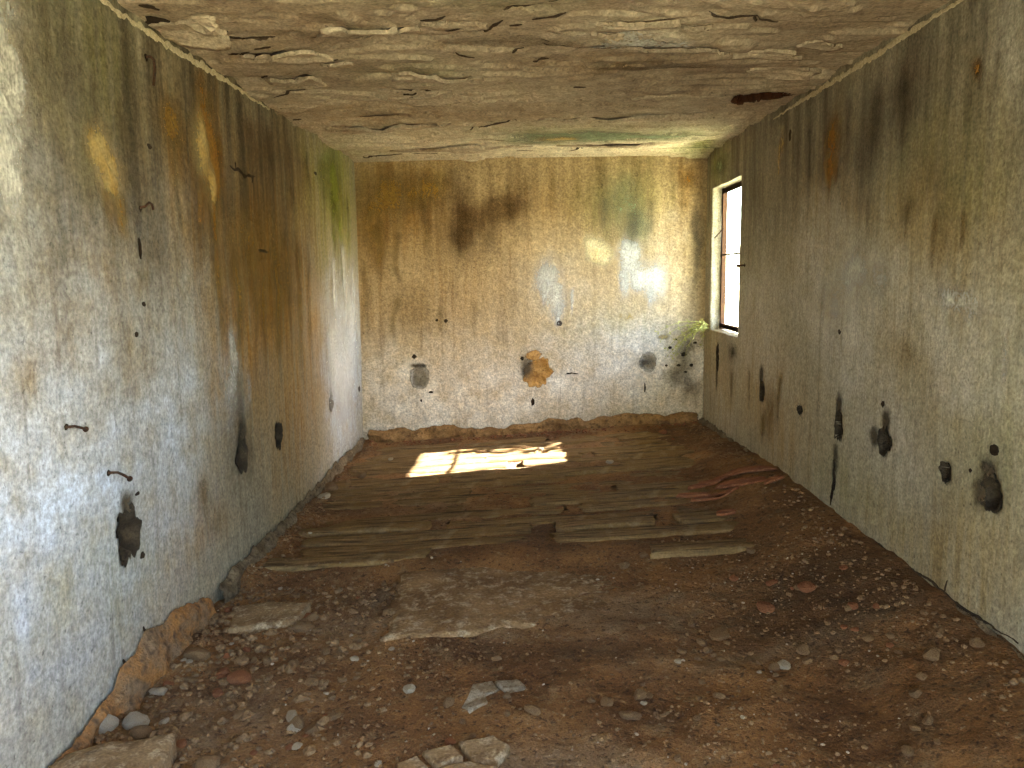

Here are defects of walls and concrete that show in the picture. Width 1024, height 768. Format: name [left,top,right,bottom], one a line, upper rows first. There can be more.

crack [138,3,160,11]
crack [227,31,275,55]
peeling [100,0,448,110]
crack [420,0,566,63]
crack [709,11,778,22]
peeling [591,0,964,120]
water stain [228,208,311,399]
spalling [410,354,433,402]
spalling [520,350,554,406]
crack [829,460,837,505]
spalling [969,444,1002,513]
spalling [54,411,749,763]